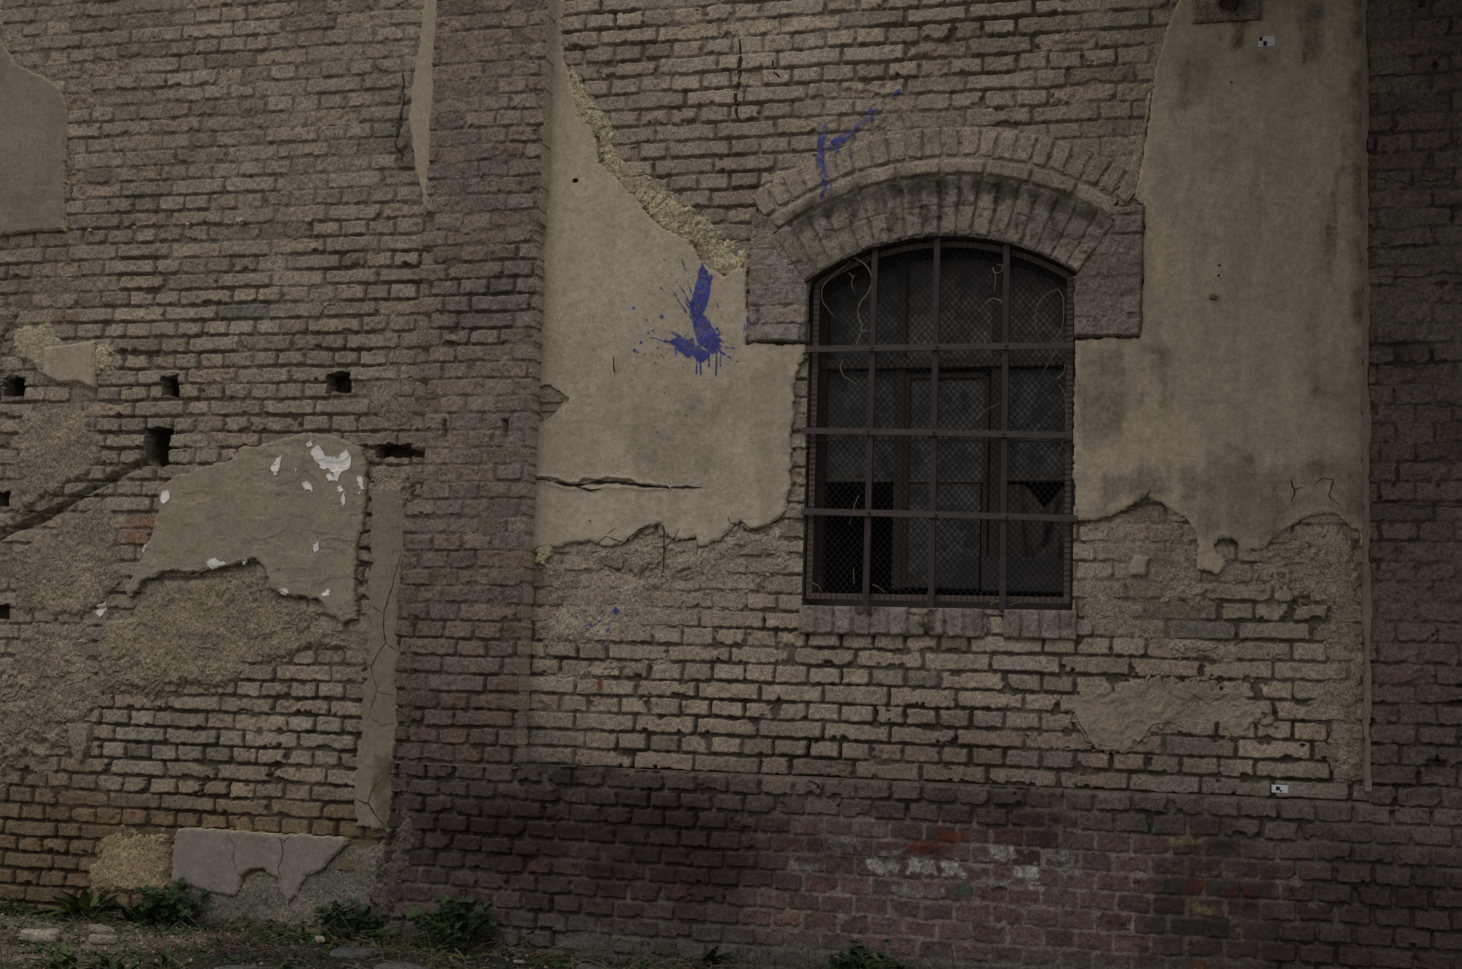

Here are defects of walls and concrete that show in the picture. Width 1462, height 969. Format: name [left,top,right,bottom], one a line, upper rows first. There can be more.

spalling [569,65,748,270]
spalling [0,305,126,517]
spalling [171,379,180,400]
peeling [0,424,425,803]
spalling [335,374,352,393]
crack [367,547,401,726]
crack [536,478,702,491]
crack [591,523,678,578]
spalling [88,584,424,931]
crack [357,778,383,823]